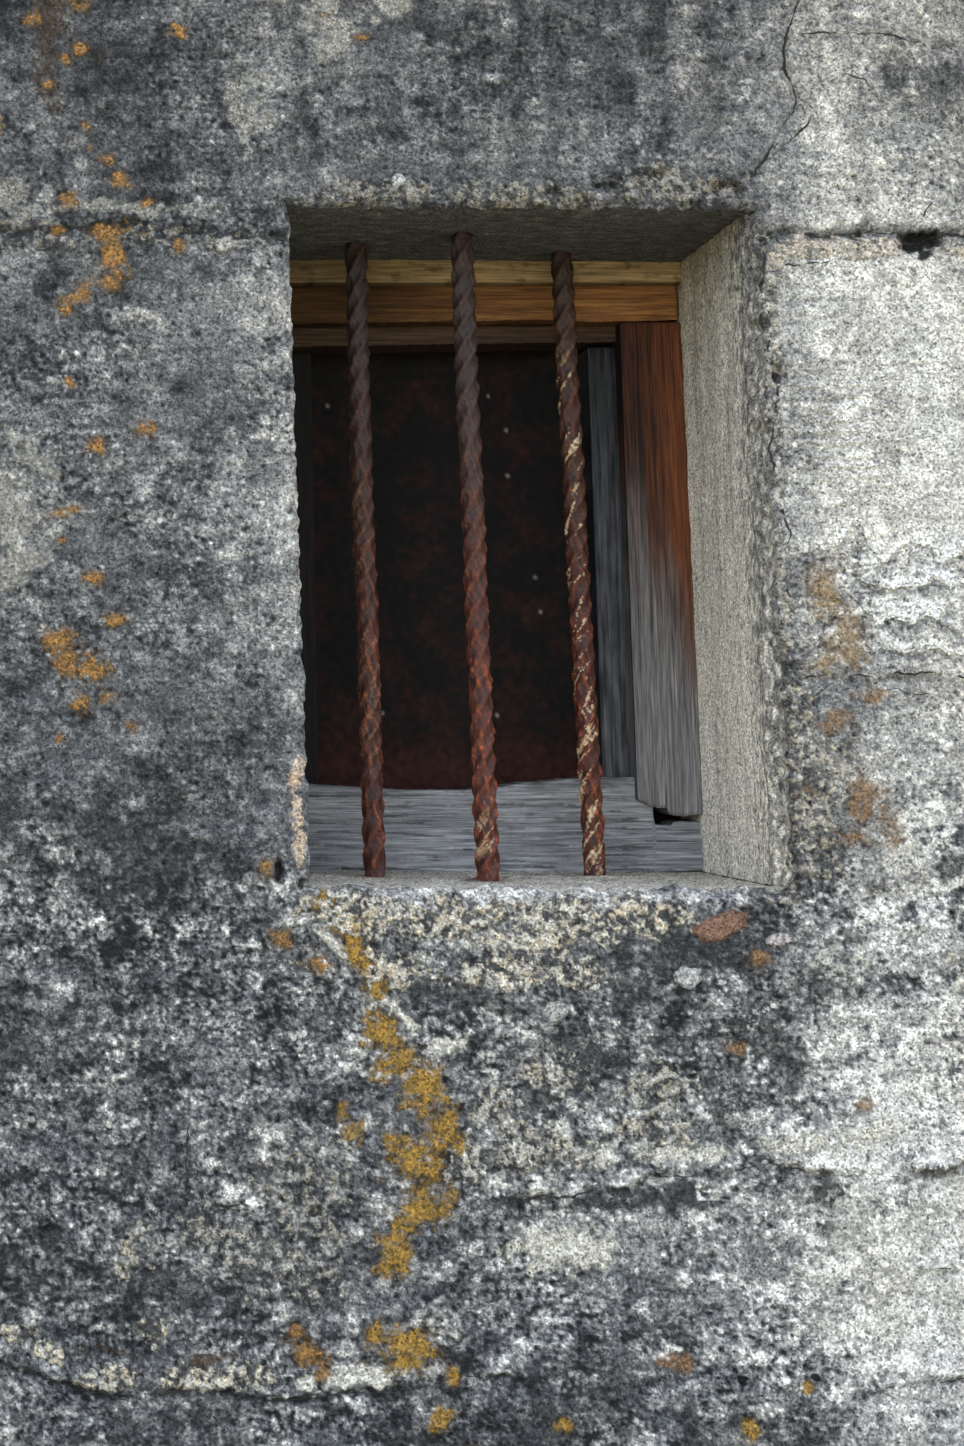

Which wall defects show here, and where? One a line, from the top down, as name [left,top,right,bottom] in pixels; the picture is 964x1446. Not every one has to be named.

crack [547,172,702,194]
spalling [286,229,964,1024]
spalling [441,1040,702,1188]
crack [513,1163,961,1201]
crack [0,1361,505,1403]